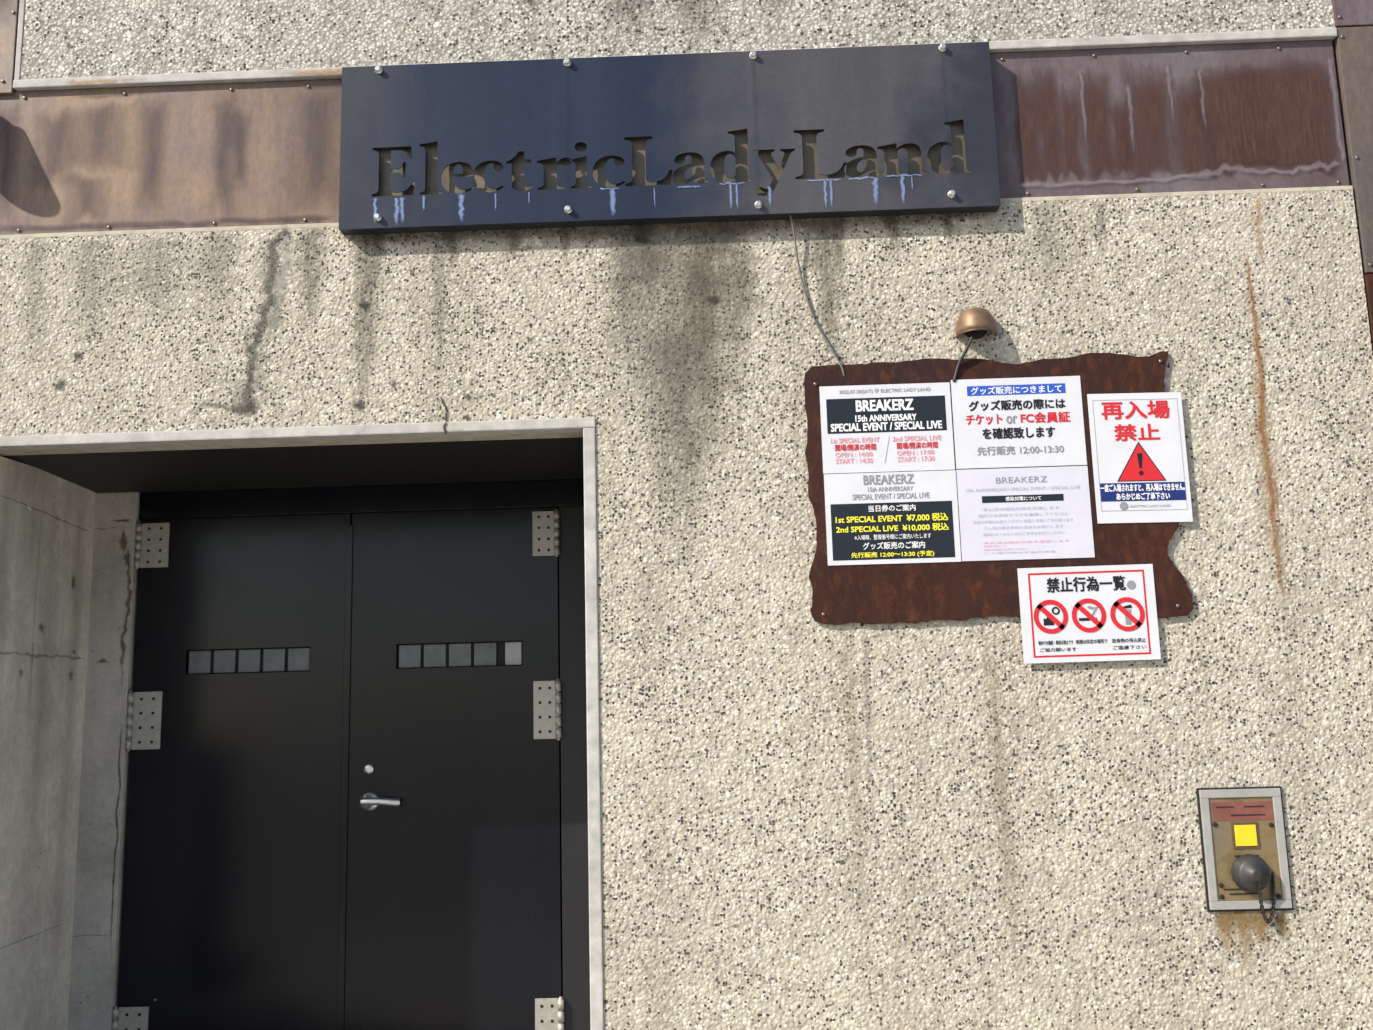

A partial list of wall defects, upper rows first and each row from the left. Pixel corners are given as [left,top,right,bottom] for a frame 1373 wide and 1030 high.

corrosion [1247,262,1281,575]